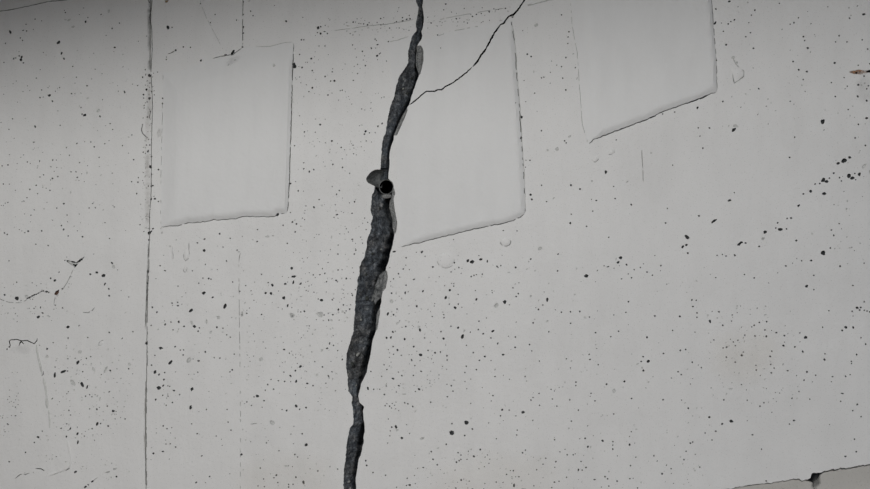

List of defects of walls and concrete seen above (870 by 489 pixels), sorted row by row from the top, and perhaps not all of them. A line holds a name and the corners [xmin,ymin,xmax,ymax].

crack [343,0,525,489]